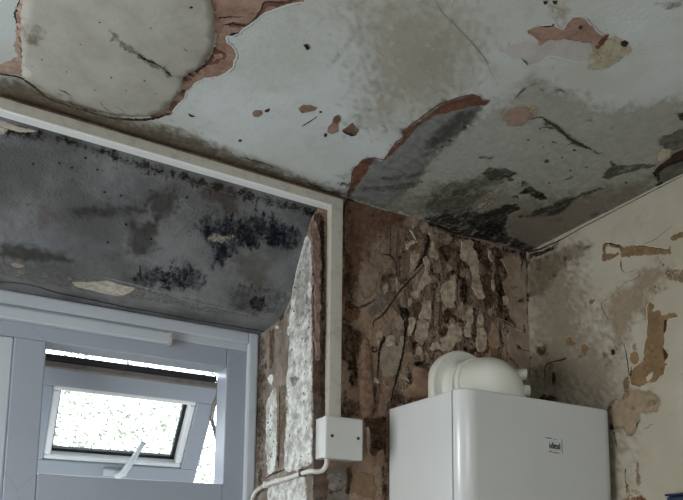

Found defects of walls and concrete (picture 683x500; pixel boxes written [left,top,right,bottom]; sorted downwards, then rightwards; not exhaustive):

crack [111,33,172,77]
spalling [150,0,307,118]
peeling [504,16,632,71]
leakage [125,222,206,291]
leakage [0,78,350,197]
leakage [56,135,315,268]
leakage [255,331,285,486]
peeling [265,213,376,500]
spalling [347,94,490,207]
peeling [376,224,546,398]
leakage [379,79,683,402]
peeling [608,302,679,447]